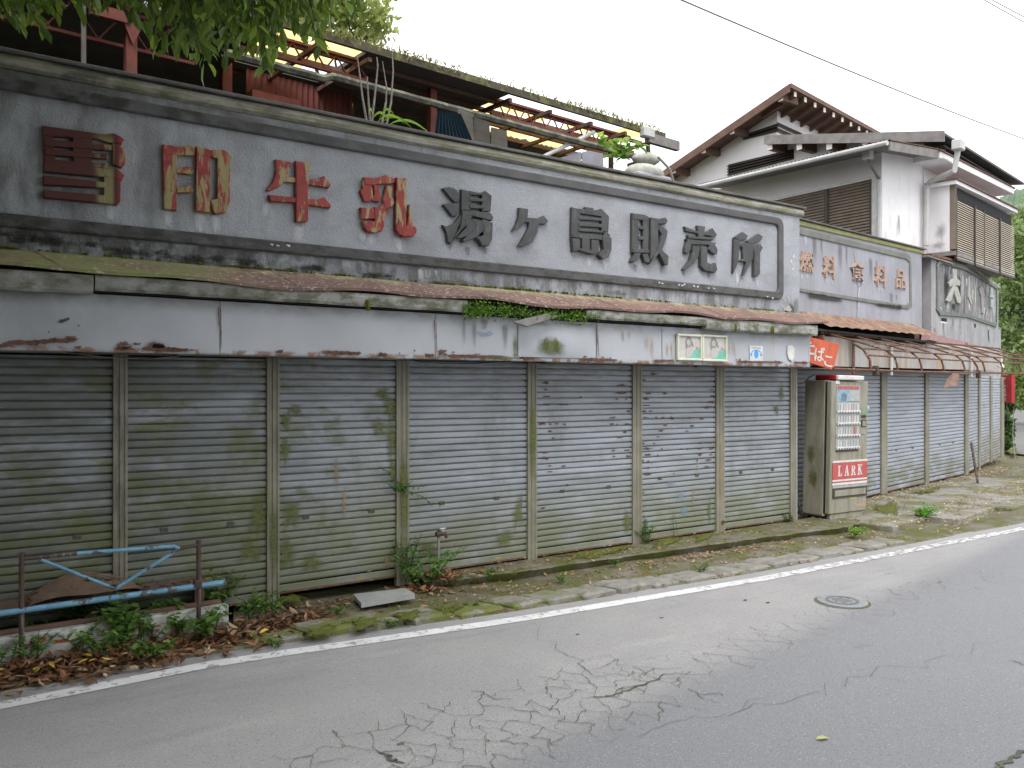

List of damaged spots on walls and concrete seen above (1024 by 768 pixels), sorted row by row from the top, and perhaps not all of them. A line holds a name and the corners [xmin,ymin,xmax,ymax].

water stain [0,232,68,245]
water stain [86,242,262,267]
corrosion [0,336,81,349]
corrosion [117,341,193,352]
corrosion [610,347,714,475]